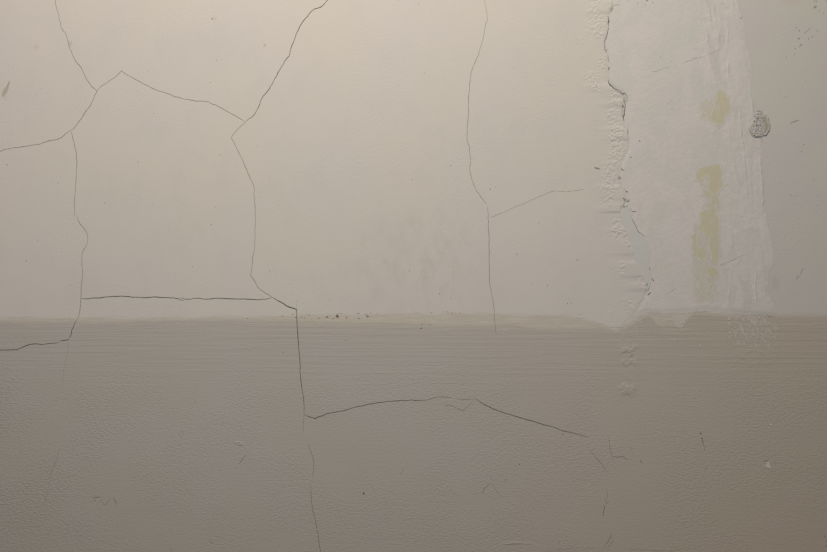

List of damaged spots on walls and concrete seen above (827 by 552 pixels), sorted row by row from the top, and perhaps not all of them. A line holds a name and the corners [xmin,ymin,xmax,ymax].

crack [0,1,626,466]